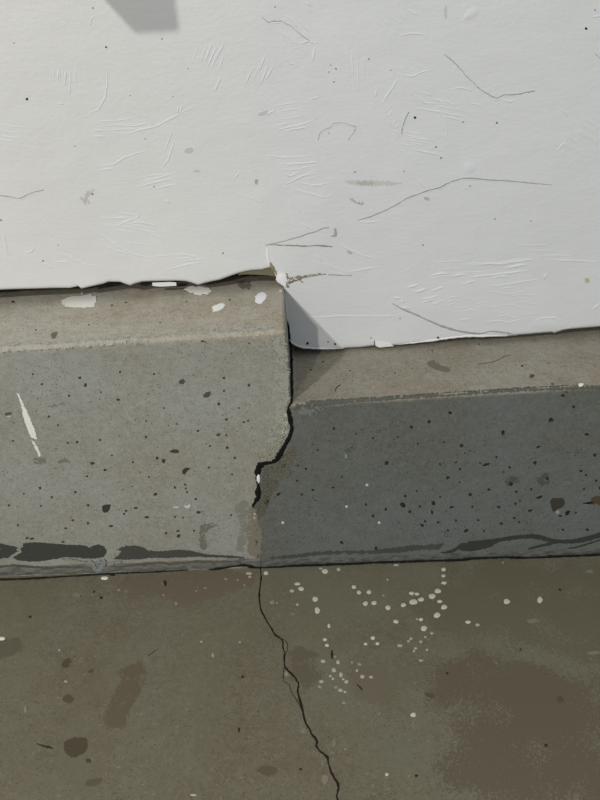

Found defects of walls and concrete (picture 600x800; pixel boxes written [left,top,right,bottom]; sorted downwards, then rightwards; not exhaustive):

crack [444,54,535,101]
crack [357,177,550,221]
peeling [238,246,288,322]
crack [252,322,294,543]
water stain [0,500,249,569]
crack [0,570,188,581]
water stain [268,532,600,672]
crack [209,553,600,800]